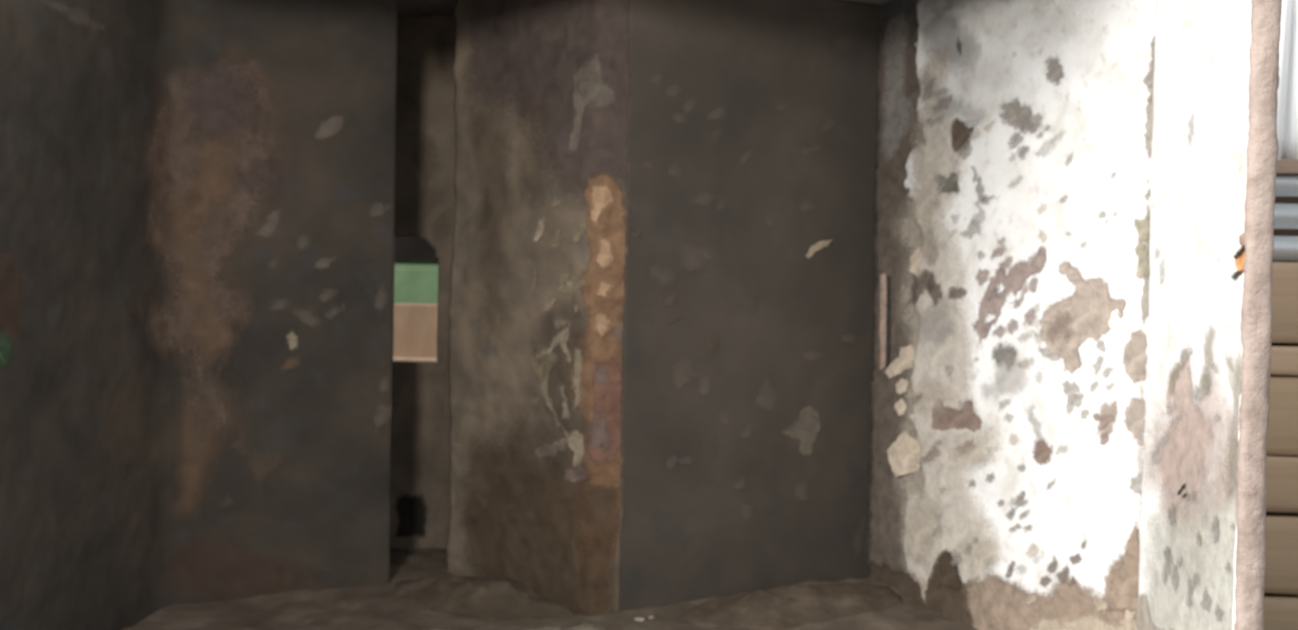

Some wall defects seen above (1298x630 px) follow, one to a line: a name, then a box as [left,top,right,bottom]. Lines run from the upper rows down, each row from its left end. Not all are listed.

flaking render [532,173,626,615]
flaking render [864,7,1126,583]
damp [866,50,1174,630]